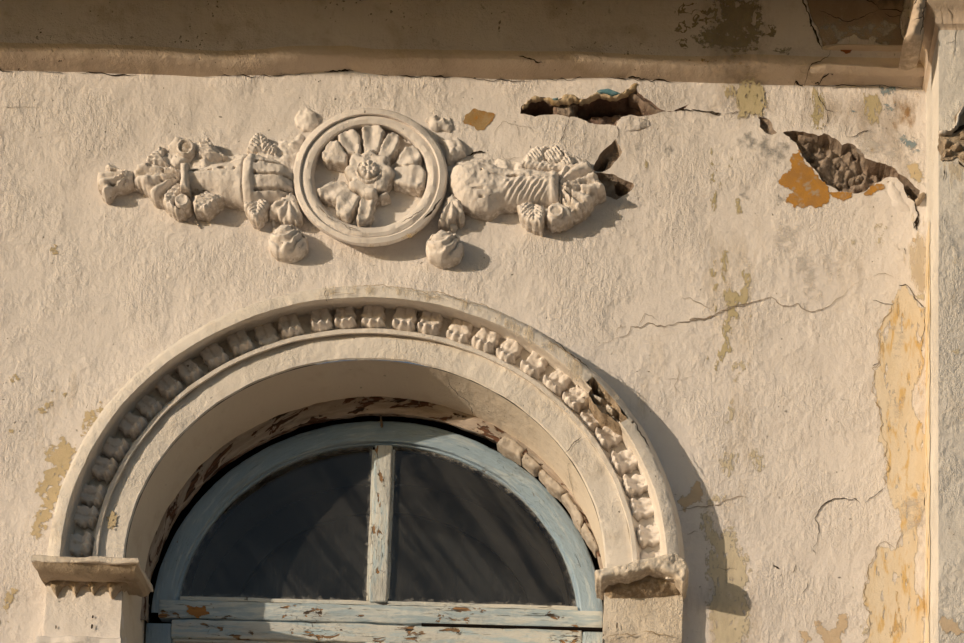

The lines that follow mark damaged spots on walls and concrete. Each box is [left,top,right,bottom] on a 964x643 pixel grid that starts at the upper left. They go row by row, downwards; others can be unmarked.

water stain [675,0,776,52]
crack [0,68,129,76]
peeling [463,108,495,131]
spalling [520,83,689,126]
water stain [722,73,768,118]
crack [794,0,927,137]
spalling [593,139,634,200]
spalling [758,117,926,208]
crack [602,273,925,343]
crack [543,336,588,368]
peeling [860,285,926,643]
crack [773,487,885,594]